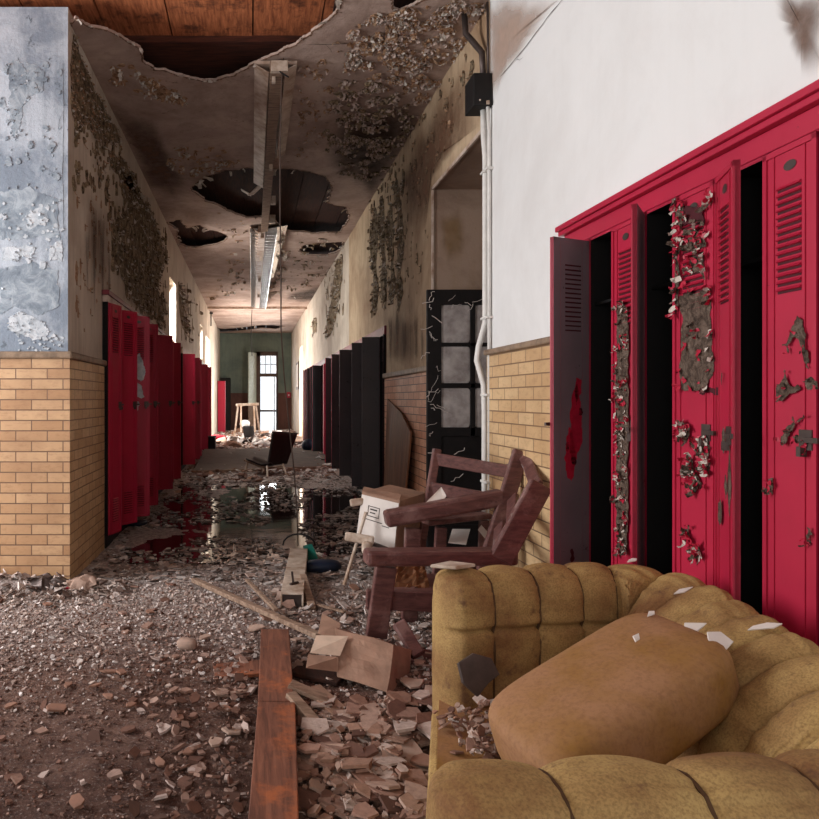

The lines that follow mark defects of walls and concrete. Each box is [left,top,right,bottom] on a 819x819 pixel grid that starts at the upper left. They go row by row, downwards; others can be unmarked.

damp [785,3,815,57]
peeling [0,0,343,351]
peeling [267,0,486,339]
peeling [665,191,722,393]
peeling [775,316,819,402]
peeling [608,299,637,563]
peeling [672,419,710,498]
peeling [773,415,807,455]
peeling [677,525,702,565]